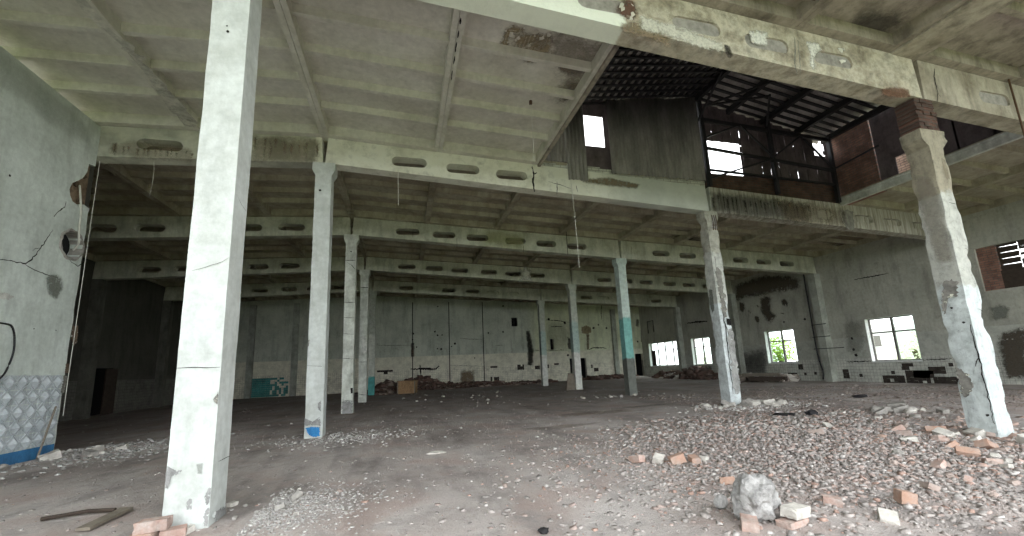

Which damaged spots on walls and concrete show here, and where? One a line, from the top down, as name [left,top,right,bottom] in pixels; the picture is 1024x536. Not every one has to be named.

peeling [749,30,768,45]
peeling [806,42,823,69]
crack [0,203,66,276]
hole [59,228,85,261]
water stain [47,275,62,298]
spalling [941,279,959,314]
crack [926,310,995,424]